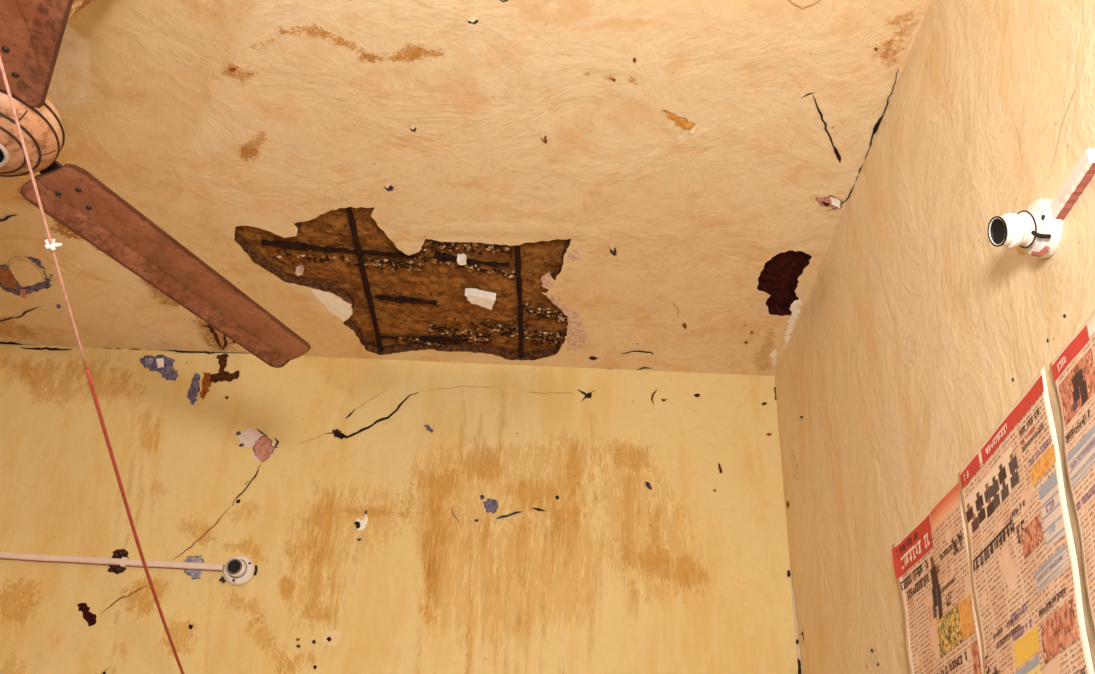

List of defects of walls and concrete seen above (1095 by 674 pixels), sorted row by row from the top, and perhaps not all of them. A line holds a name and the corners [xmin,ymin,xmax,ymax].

crack [802,68,899,211]
peeling [0,256,53,298]
spalling [234,207,587,360]
spalling [757,250,812,366]
peeling [236,428,279,463]
crack [297,386,504,445]